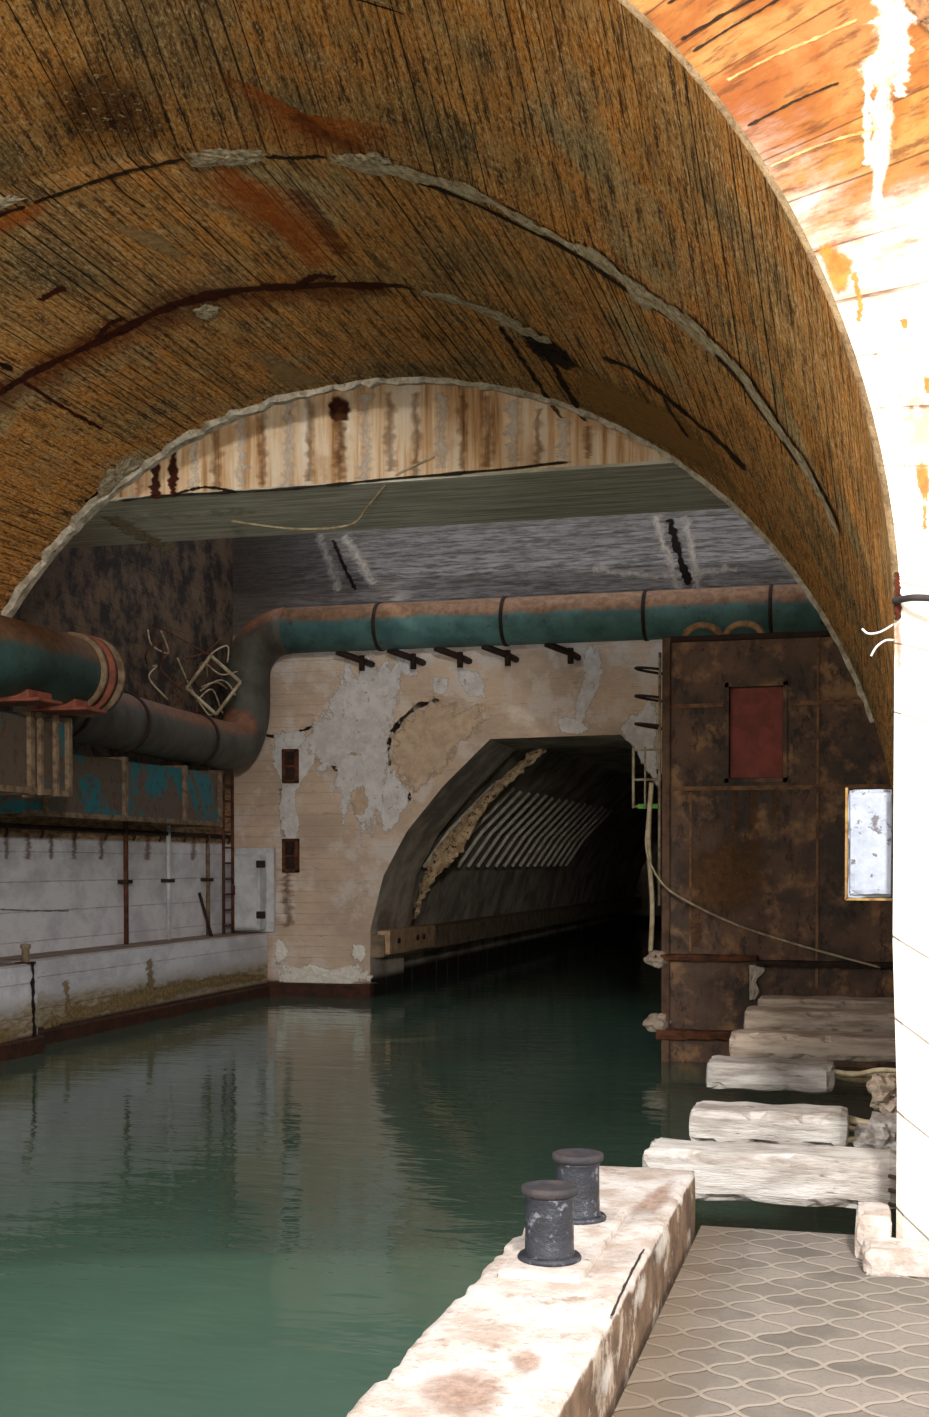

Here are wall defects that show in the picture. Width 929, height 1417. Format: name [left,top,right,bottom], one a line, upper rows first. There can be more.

crack [357,0,403,15]
crack [34,158,185,207]
corrosion [819,244,864,322]
corrosion [148,442,218,499]
crack [0,273,410,430]
corrosion [328,394,370,479]
crack [499,326,587,422]
crack [603,357,746,471]
peeling [266,649,485,839]